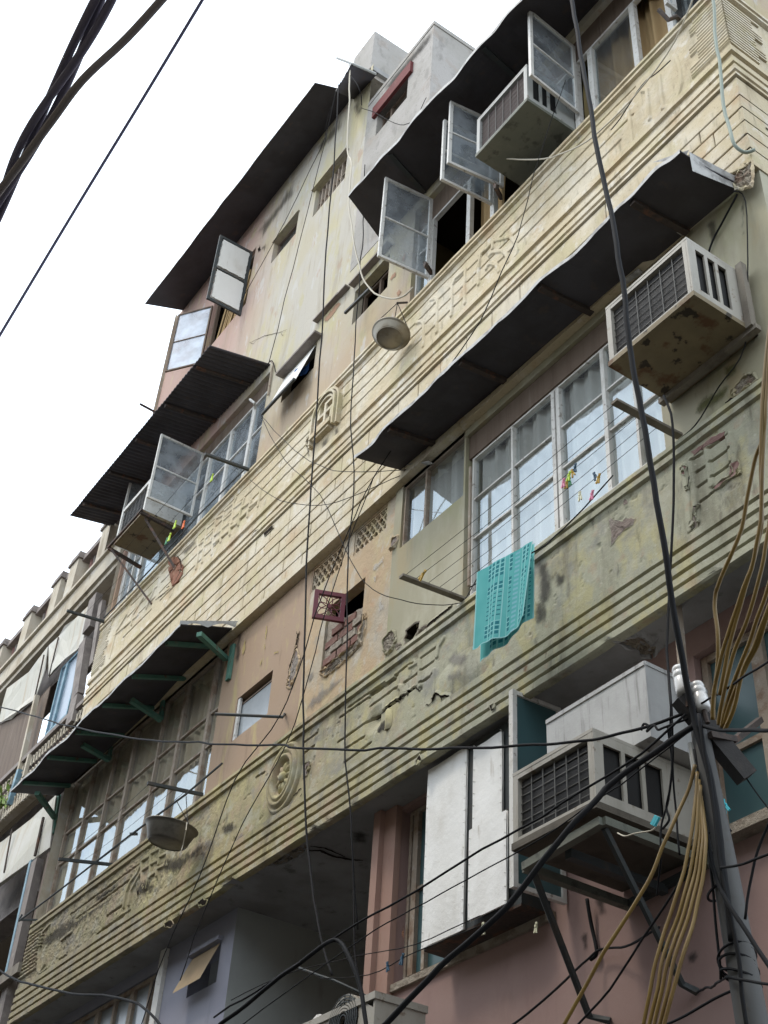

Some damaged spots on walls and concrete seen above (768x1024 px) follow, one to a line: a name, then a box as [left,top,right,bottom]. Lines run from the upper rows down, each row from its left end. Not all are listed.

spalling [731,159,755,191]
peeling [679,431,725,491]
spalling [712,459,742,491]
peeling [608,498,636,547]
spalling [688,505,700,531]
leakage [536,564,564,622]
flaking render [286,602,383,706]
spalling [381,609,428,656]
crack [300,846,363,861]